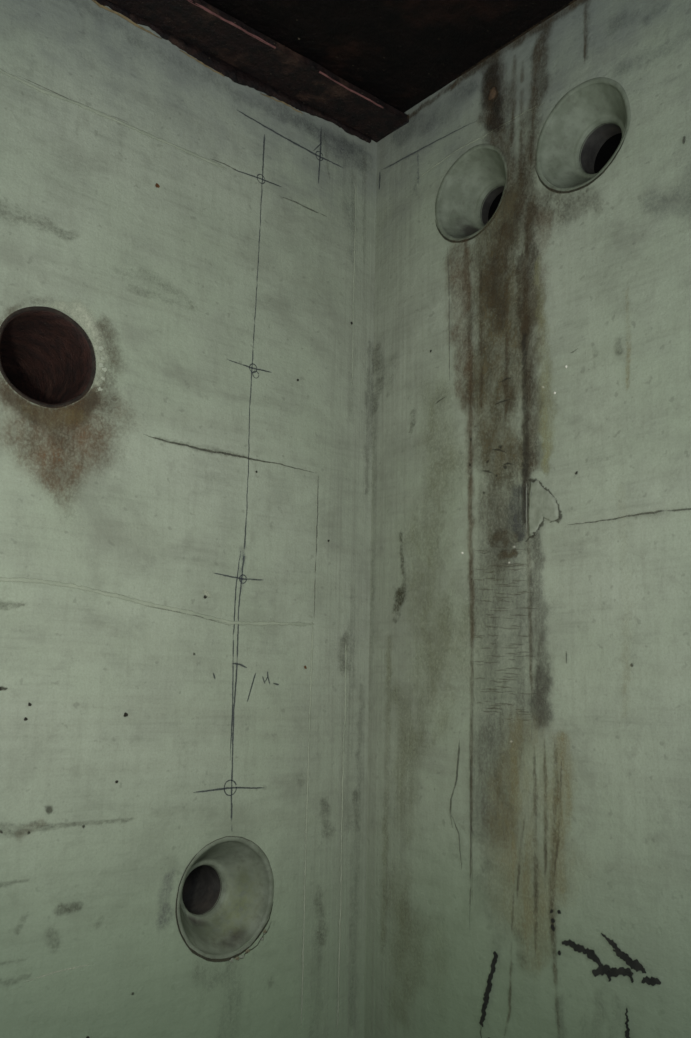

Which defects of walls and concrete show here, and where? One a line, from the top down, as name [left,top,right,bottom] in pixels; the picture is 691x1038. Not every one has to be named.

rust [2,383,105,491]
crack [569,508,691,525]